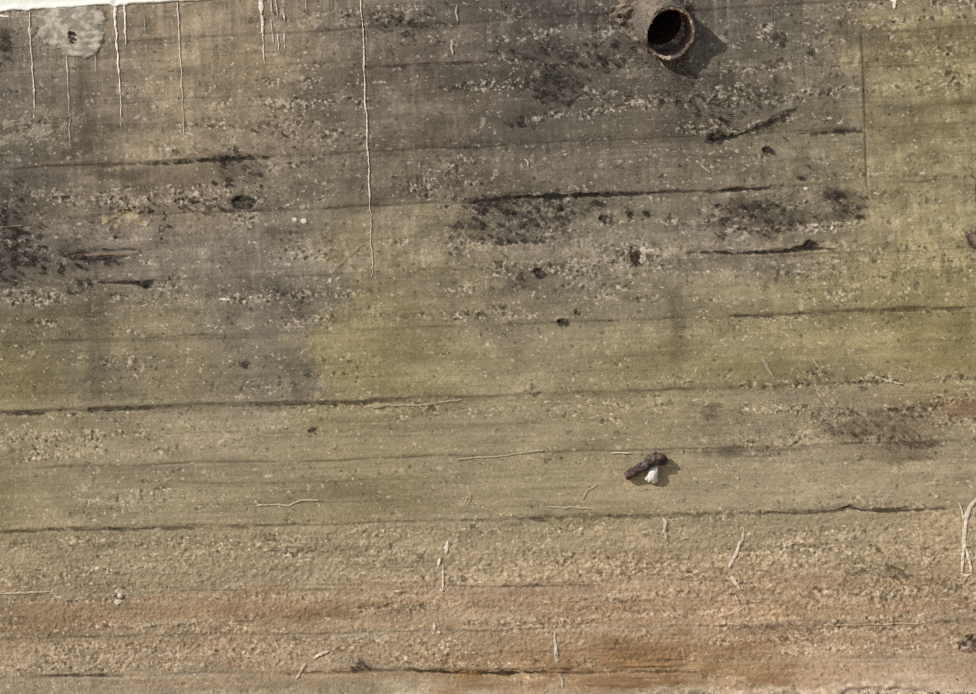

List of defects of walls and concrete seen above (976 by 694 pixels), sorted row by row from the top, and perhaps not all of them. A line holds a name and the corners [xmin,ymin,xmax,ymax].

rust [623,451,667,483]